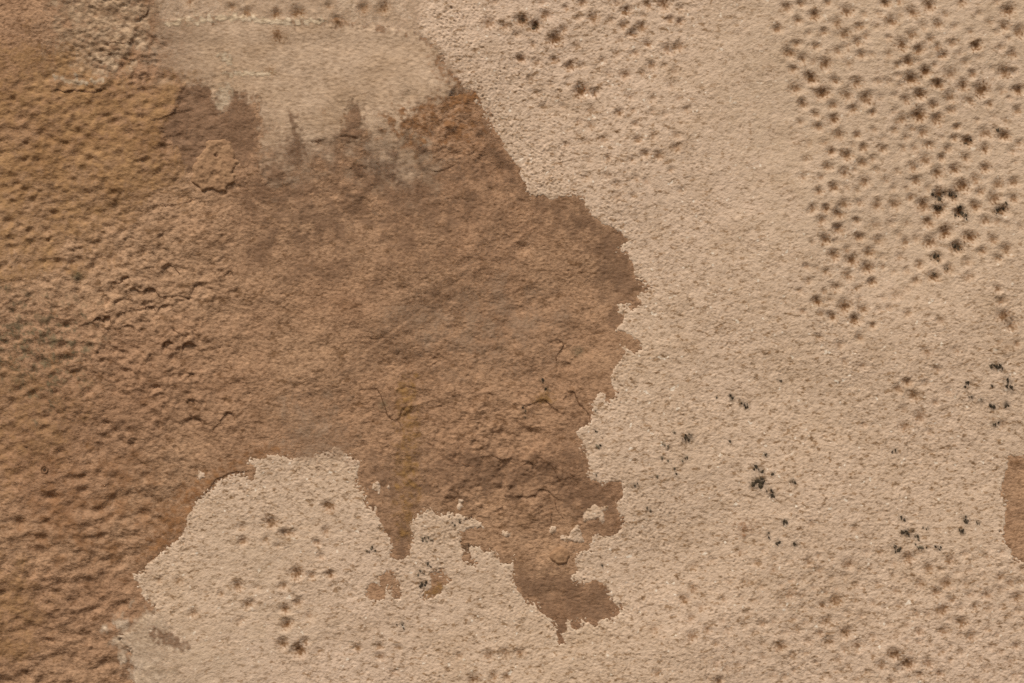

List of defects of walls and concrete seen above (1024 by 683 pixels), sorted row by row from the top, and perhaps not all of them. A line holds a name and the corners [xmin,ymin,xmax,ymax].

water stain [243,105,458,258]